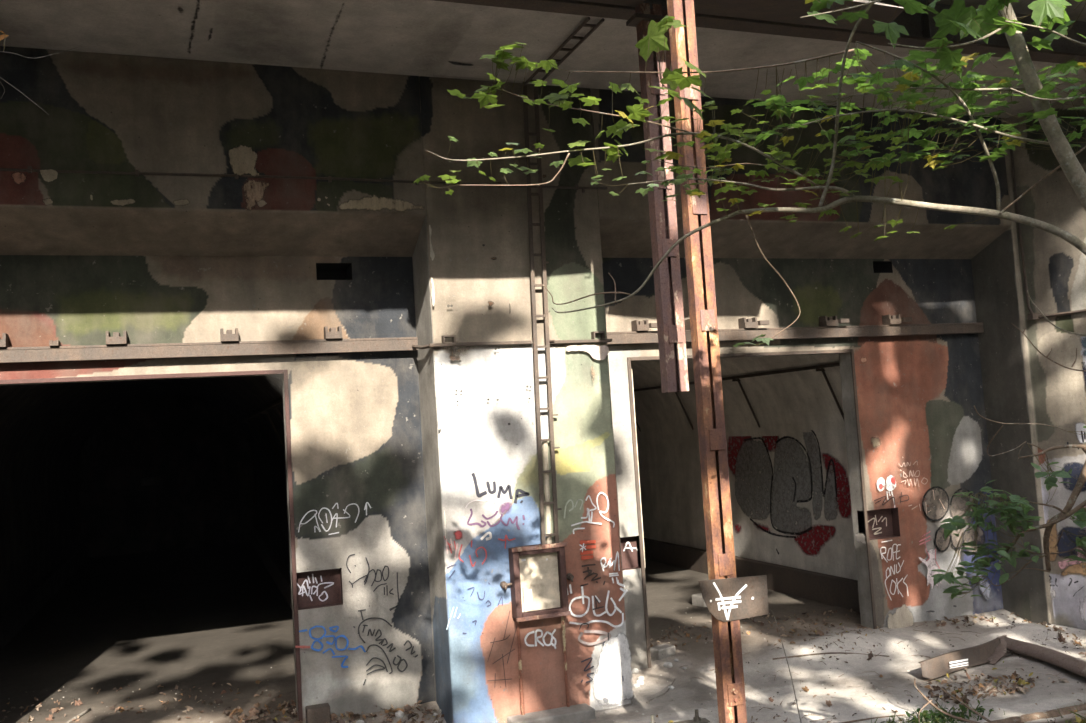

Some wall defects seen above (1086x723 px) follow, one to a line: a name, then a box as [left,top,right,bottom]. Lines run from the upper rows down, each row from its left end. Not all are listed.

crack [178,0,213,53]
peeling [228,145,269,211]